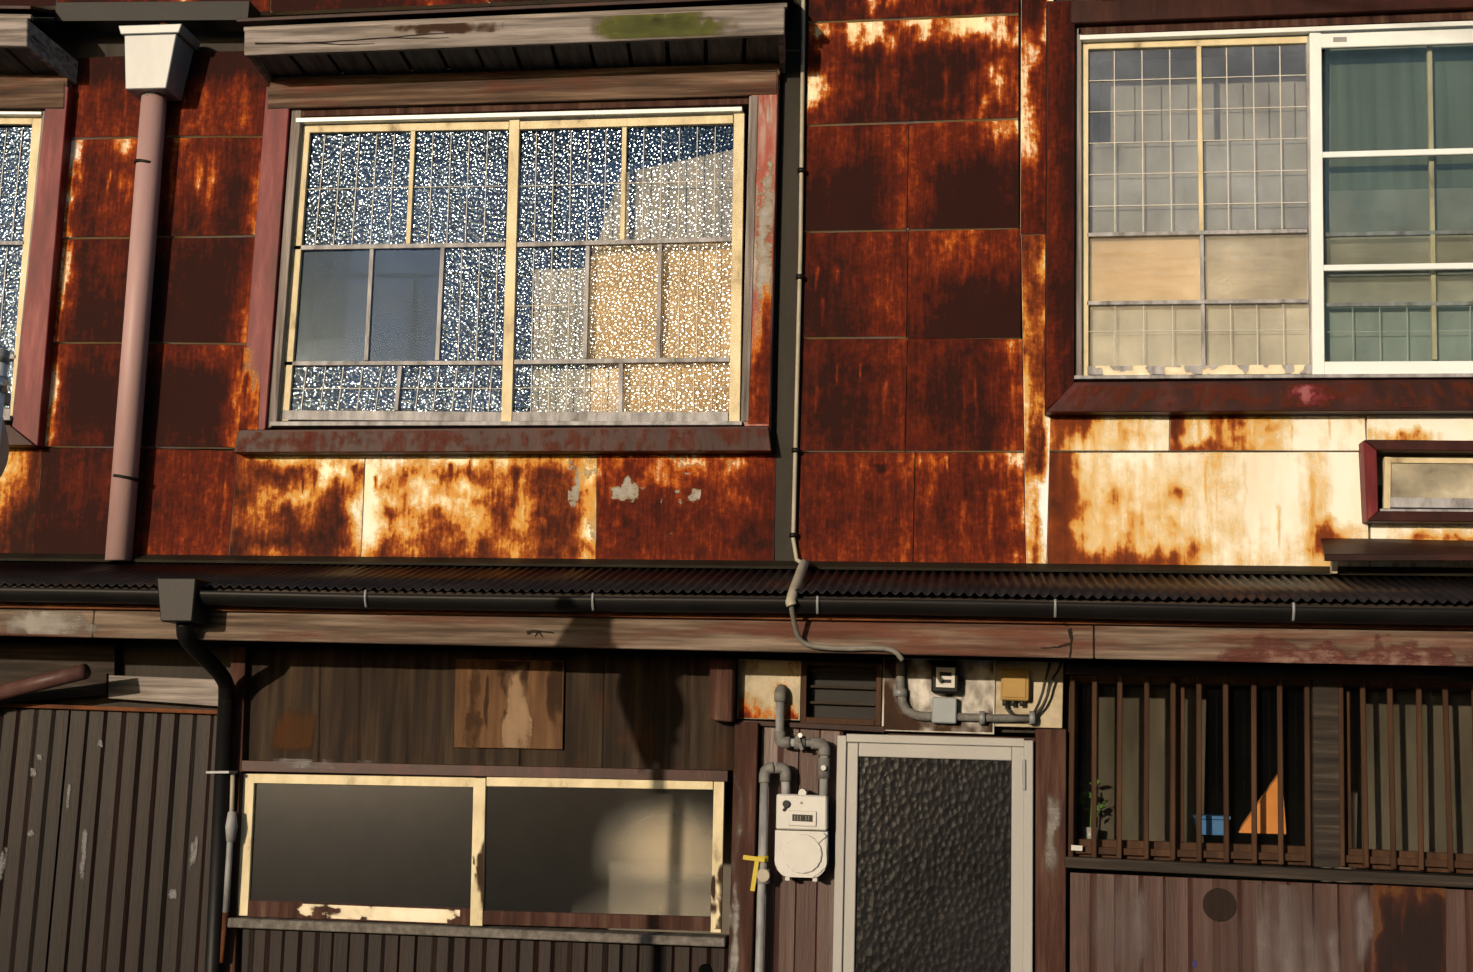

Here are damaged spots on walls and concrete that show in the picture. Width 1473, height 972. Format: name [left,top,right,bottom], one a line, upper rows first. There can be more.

rust [0,0,531,12]
rust [0,56,141,554]
rust [133,51,776,561]
rust [798,0,1293,565]
rust [1368,426,1431,440]
peeling [568,455,596,507]
peeling [611,475,644,502]
peeling [660,455,701,504]
rust [1303,452,1364,566]
rust [1399,527,1473,540]
rust [738,662,798,719]
peeling [297,904,460,923]